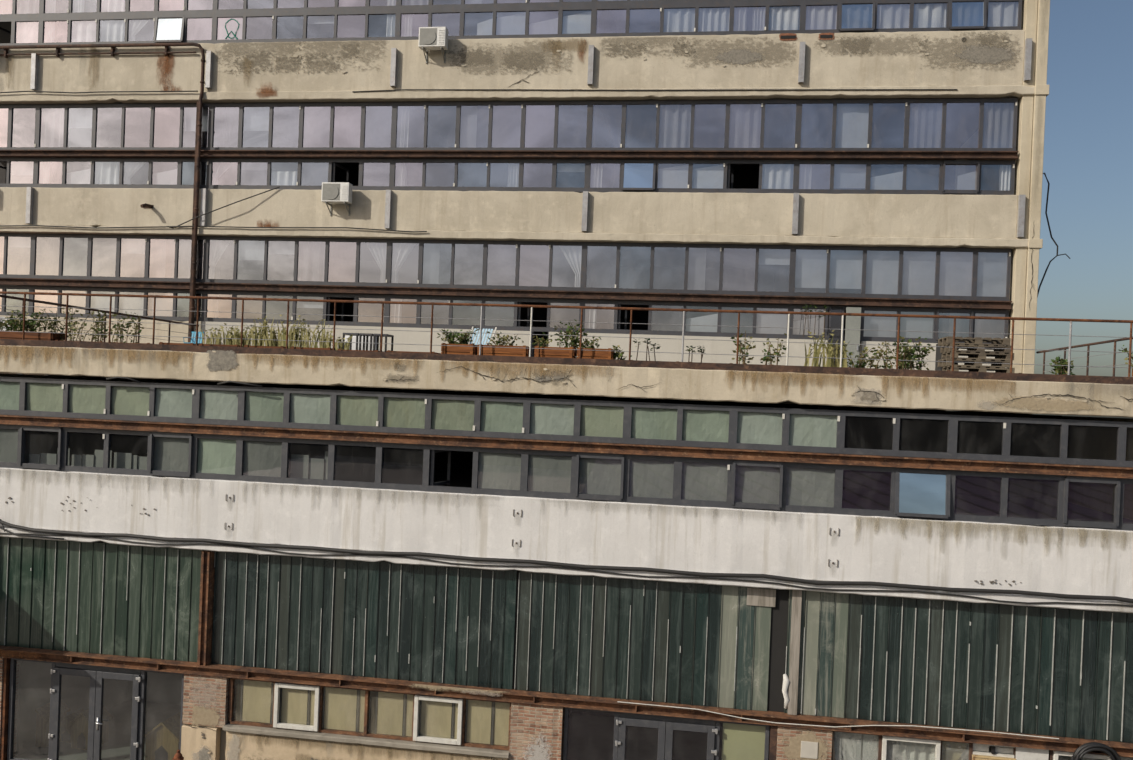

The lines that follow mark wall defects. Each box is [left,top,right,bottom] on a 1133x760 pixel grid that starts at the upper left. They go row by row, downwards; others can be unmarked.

corrosion [157,49,179,91]
corrosion [257,85,276,97]
water stain [1,345,193,367]
water stain [248,354,417,367]
crack [390,366,574,385]
crack [1002,394,1133,410]